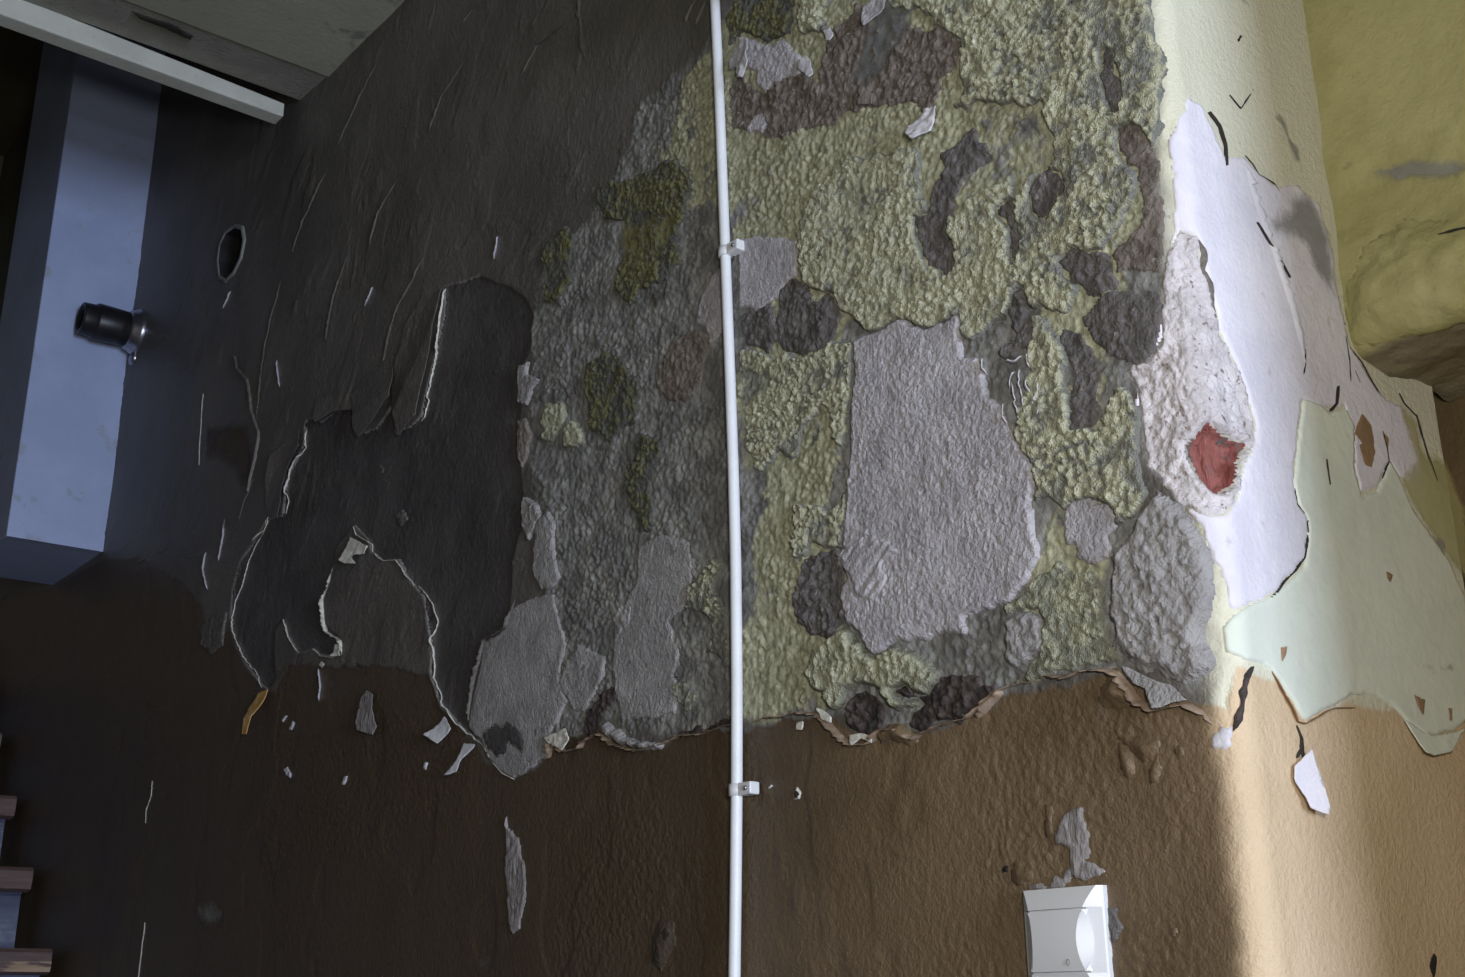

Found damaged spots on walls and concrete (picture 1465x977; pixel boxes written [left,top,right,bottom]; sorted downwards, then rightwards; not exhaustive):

flaking render [728,0,961,140]
flaking render [915,127,994,275]
flaking render [998,169,1064,261]
flaking render [741,278,842,356]
flaking render [980,288,1038,425]
peeling [1059,48,1419,609]
crack [233,356,260,518]
peeling [230,276,533,780]
flaking render [792,549,846,639]
flaking render [796,690,885,745]
flaking render [897,675,994,732]
peeling [1122,666,1186,708]